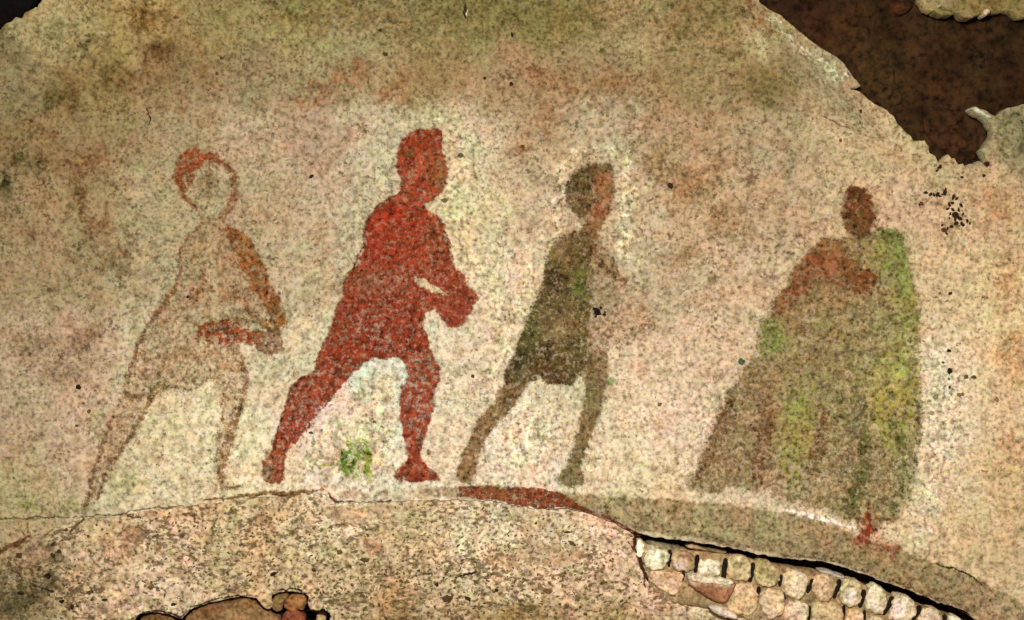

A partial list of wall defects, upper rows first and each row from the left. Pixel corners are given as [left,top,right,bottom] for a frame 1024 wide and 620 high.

flaking render [759,0,1024,178]
leakage [310,379,388,478]
crack [0,488,386,592]
flaking render [86,590,330,620]
crack [131,588,332,619]
crack [611,532,649,591]
flaking render [598,521,975,620]
crack [936,563,992,592]